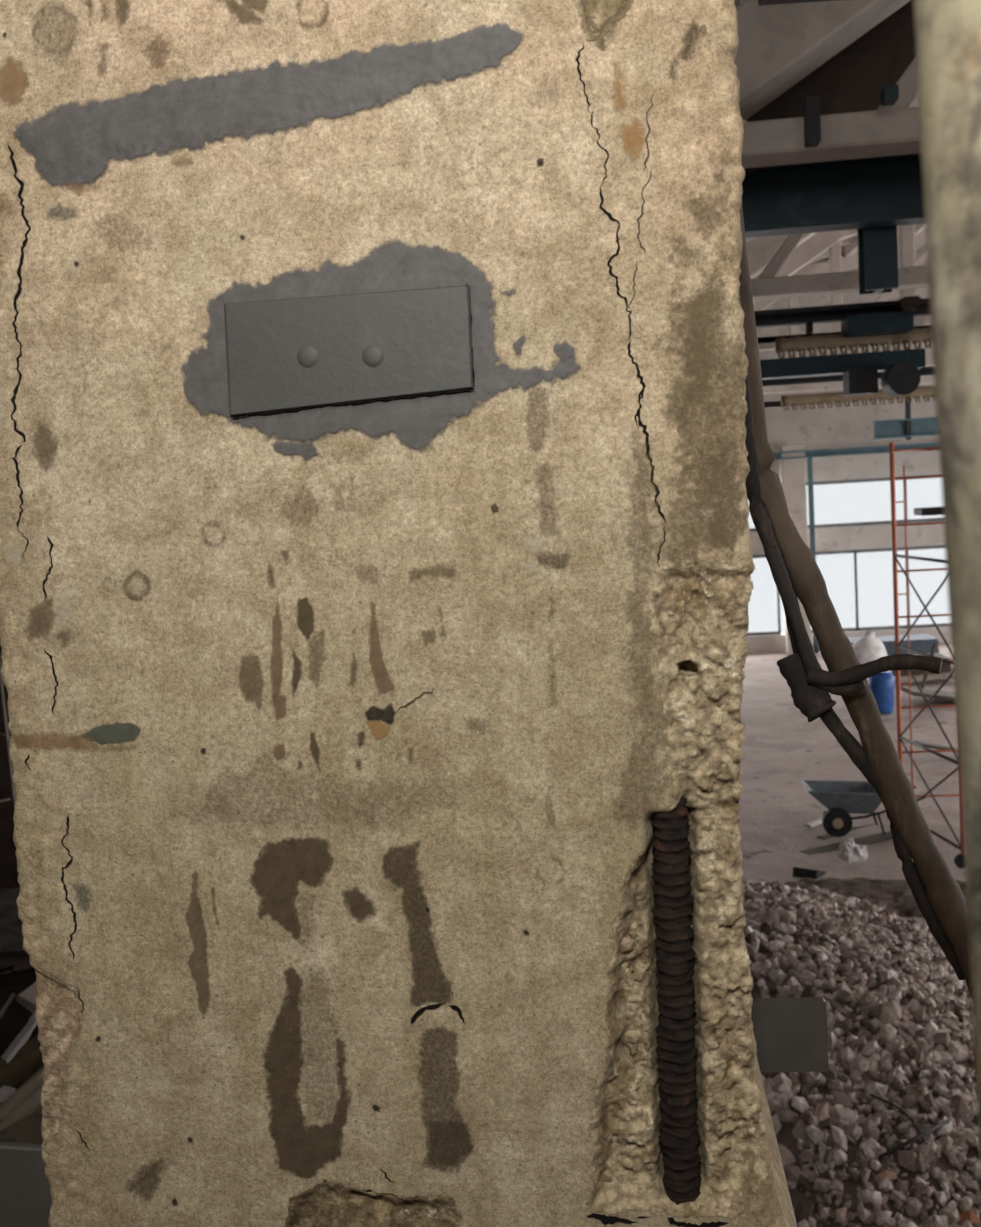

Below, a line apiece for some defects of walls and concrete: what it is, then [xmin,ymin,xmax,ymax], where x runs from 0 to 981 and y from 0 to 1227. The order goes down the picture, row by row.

crack [7,143,53,600]
crack [575,45,667,567]
crack [44,648,59,714]
water stain [239,597,324,718]
crack [61,814,84,1014]
water stain [251,837,333,939]
water stain [343,887,374,921]
water stain [382,842,451,1006]
spalling [588,558,772,1220]
water stain [264,967,349,1178]
crack [411,1003,466,1025]
spalling [284,1182,462,1227]